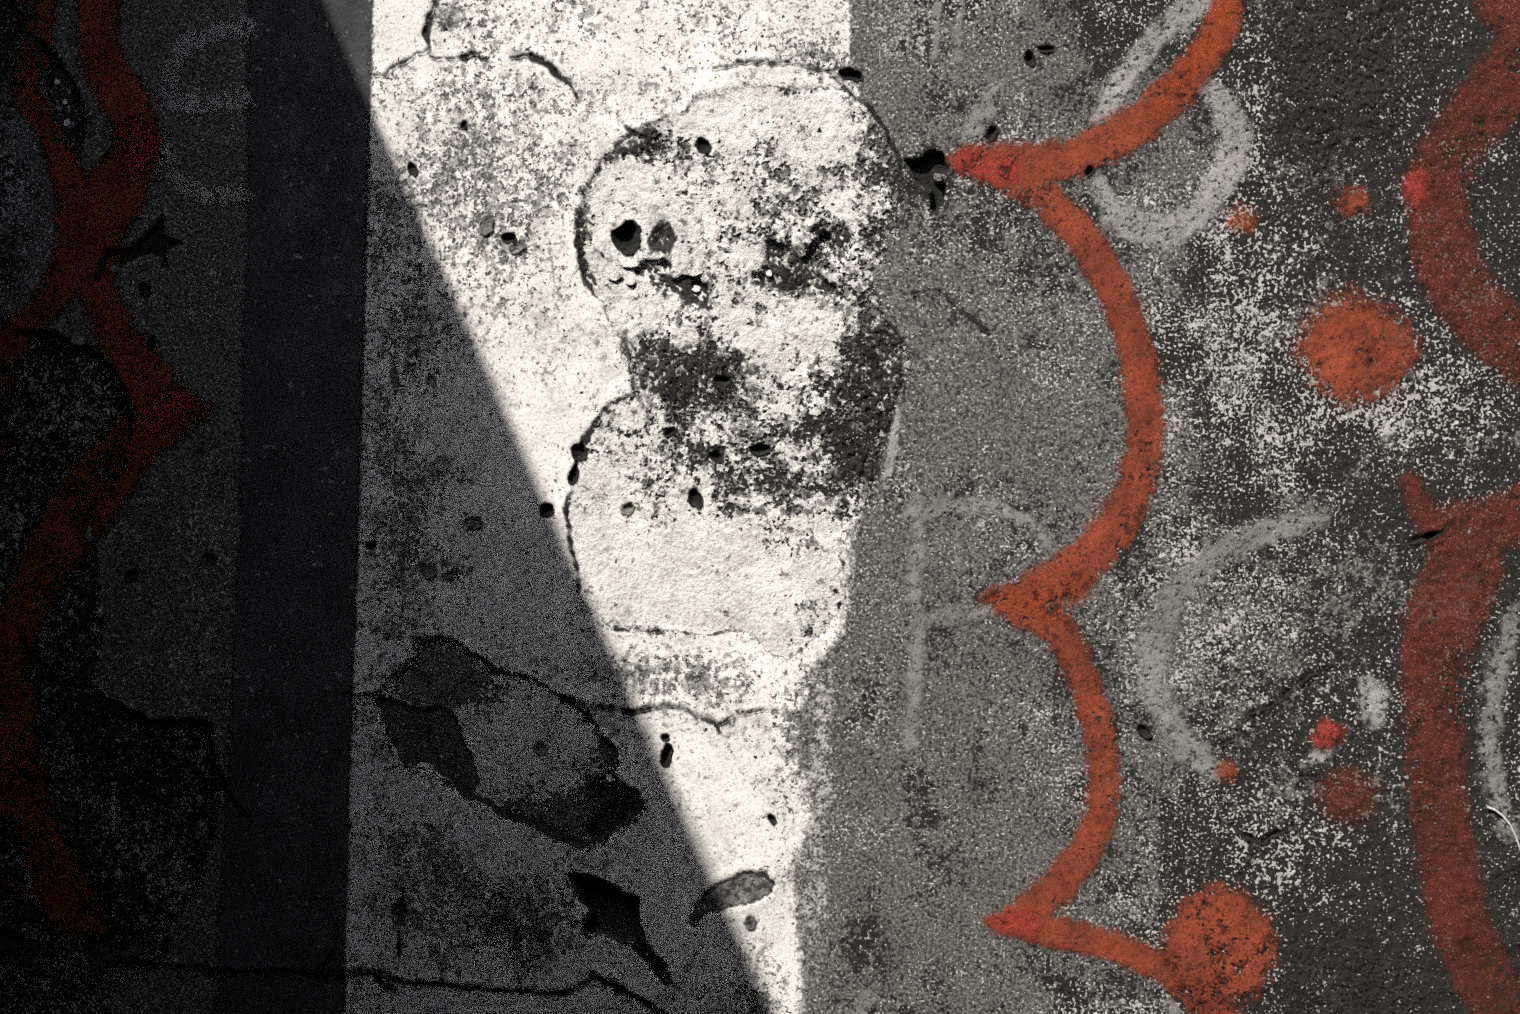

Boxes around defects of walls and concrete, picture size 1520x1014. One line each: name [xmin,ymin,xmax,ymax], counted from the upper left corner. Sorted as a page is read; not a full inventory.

crack [370,0,579,98]
crack [622,122,647,140]
crack [712,59,903,185]
crack [562,507,581,593]
peeling [0,329,227,979]
crack [613,625,665,635]
peeling [376,636,648,849]
crack [112,855,686,1014]
hole [568,873,668,976]
peeling [690,871,775,929]